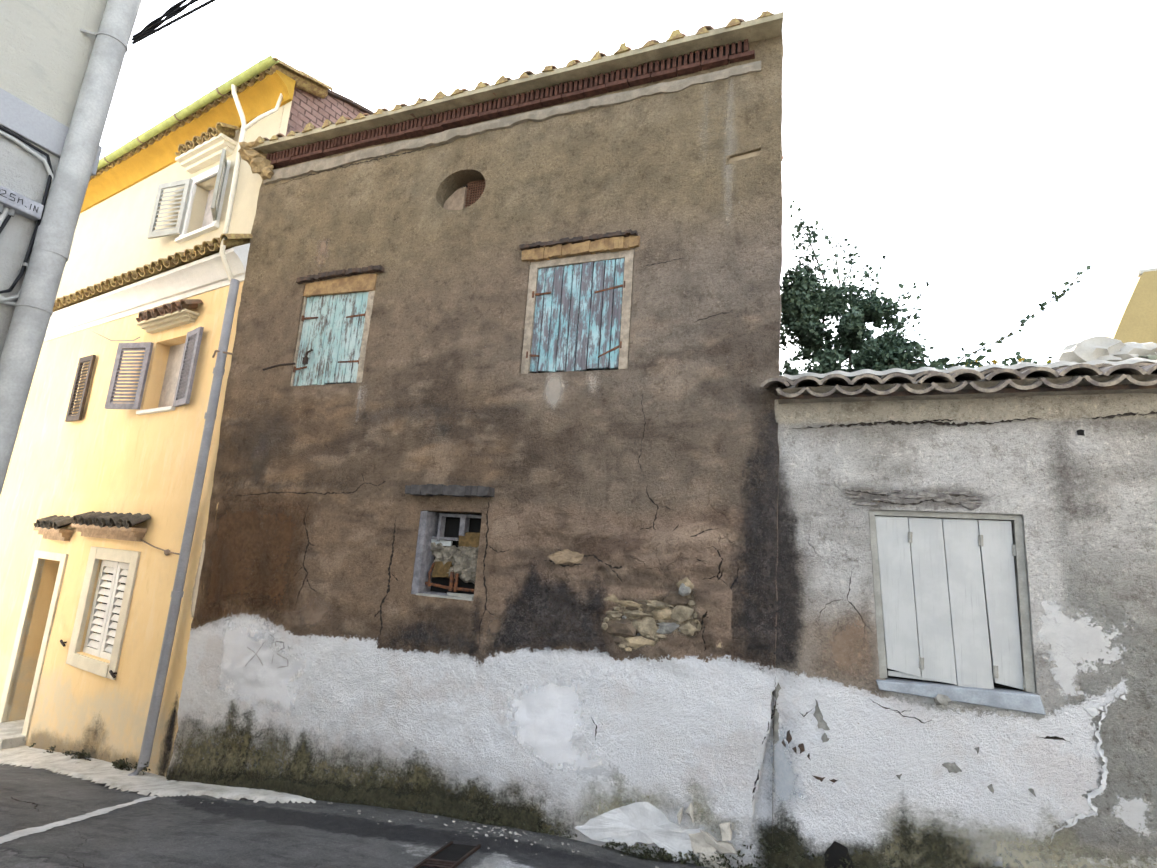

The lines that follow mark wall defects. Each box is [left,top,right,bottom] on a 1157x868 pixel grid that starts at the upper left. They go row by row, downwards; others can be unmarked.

crack [230,473,398,643]
flaking render [543,549,584,567]
damp [731,410,801,667]
flaking render [601,577,702,652]
crack [696,612,708,651]
flaking render [772,683,810,759]
flaking render [813,699,830,743]
damp [287,733,313,782]
damp [402,755,438,792]
peeling [1049,688,1127,845]
damp [896,799,954,868]
damp [1102,795,1157,837]